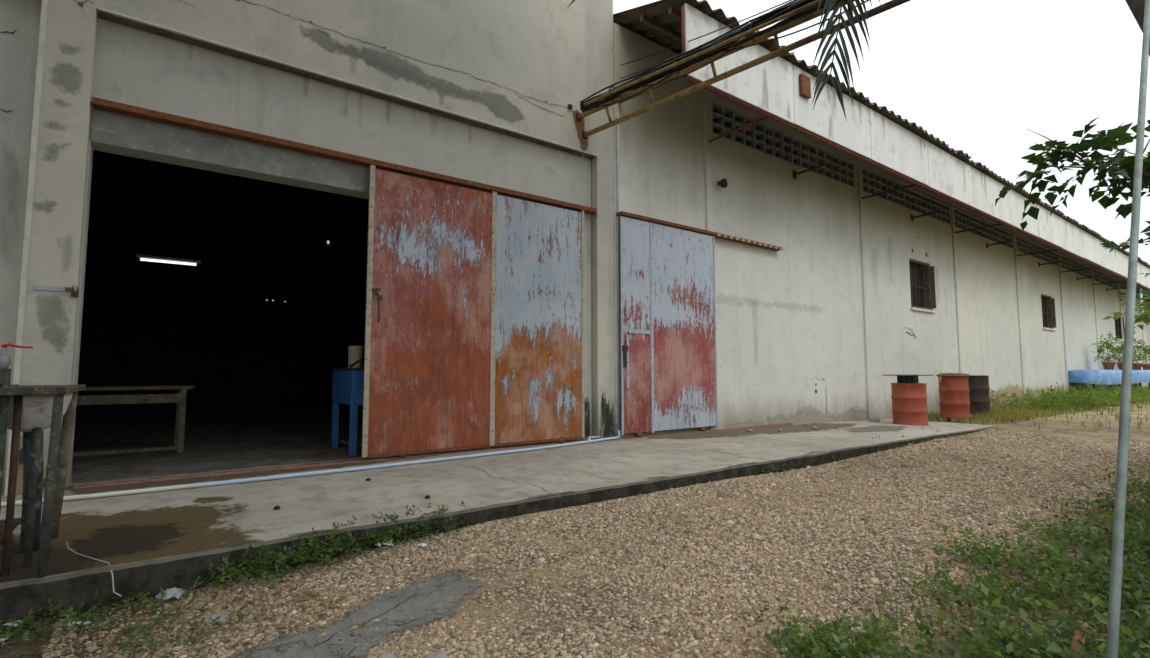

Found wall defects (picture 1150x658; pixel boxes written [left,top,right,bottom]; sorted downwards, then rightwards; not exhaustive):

crack [237,0,567,117]
damp [0,497,262,583]